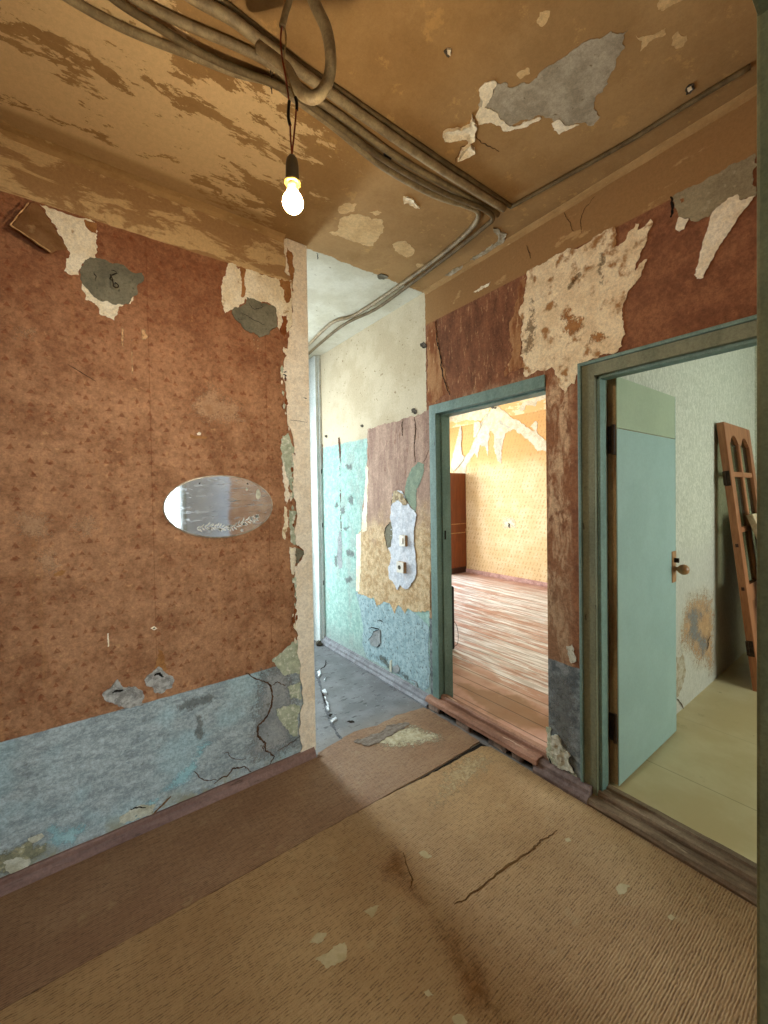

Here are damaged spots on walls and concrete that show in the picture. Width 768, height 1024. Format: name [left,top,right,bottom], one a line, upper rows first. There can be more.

peeling [443,29,666,162]
peeling [84,219,97,234]
flaking render [670,153,757,232]
spalling [82,284,133,320]
flaking render [519,219,653,393]
flaking render [449,395,546,474]
flaking render [248,248,304,763]
peeling [334,462,431,691]
spalling [102,649,174,709]
crack [192,673,300,784]
leakage [676,588,714,698]
crack [454,830,557,904]